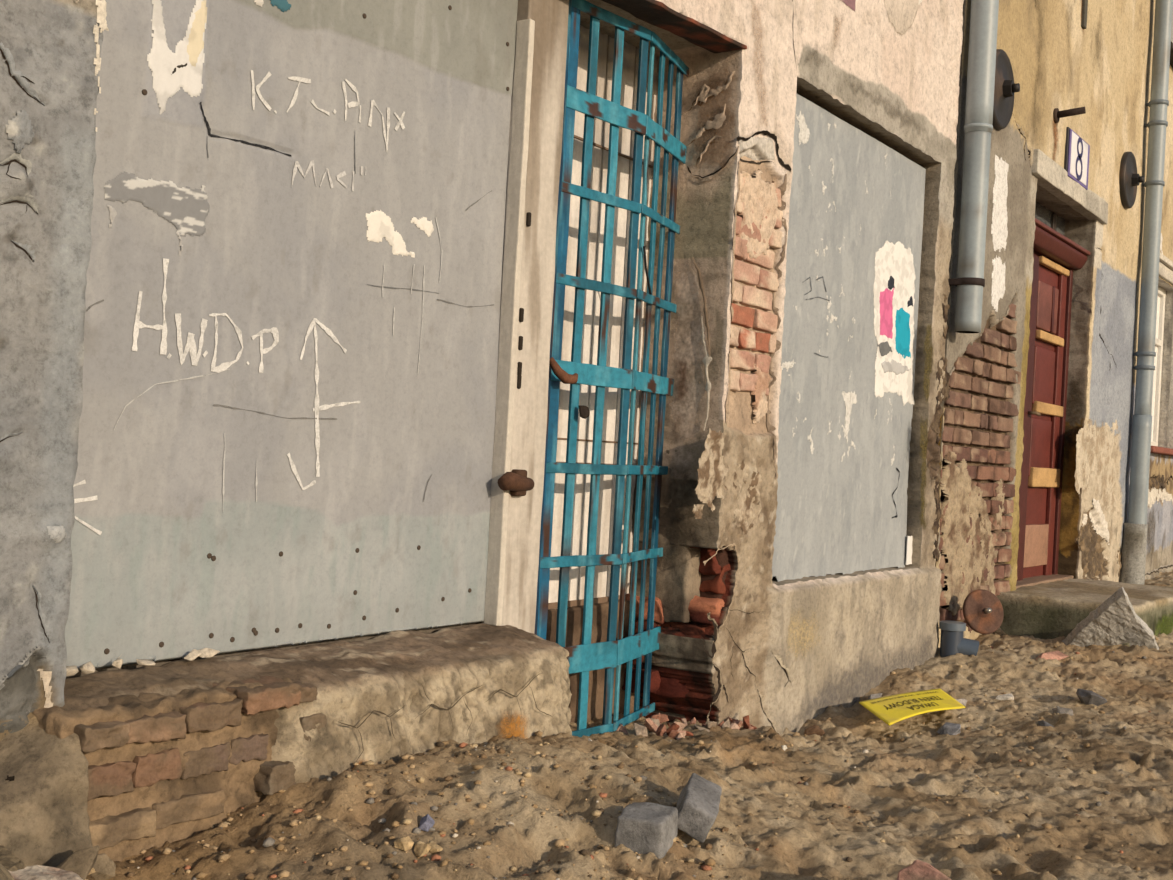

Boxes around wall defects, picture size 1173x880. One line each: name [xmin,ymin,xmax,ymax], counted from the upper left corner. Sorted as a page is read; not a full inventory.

crack [0,42,45,106]
peeling [93,0,109,93]
peeling [796,111,810,145]
flaking render [626,71,796,637]
flaking render [942,294,950,339]
peeling [827,371,857,462]
flaking render [930,303,1021,633]
peeling [1074,418,1122,580]
peeling [1148,474,1173,509]
spalling [622,655,691,698]
crack [701,602,792,734]